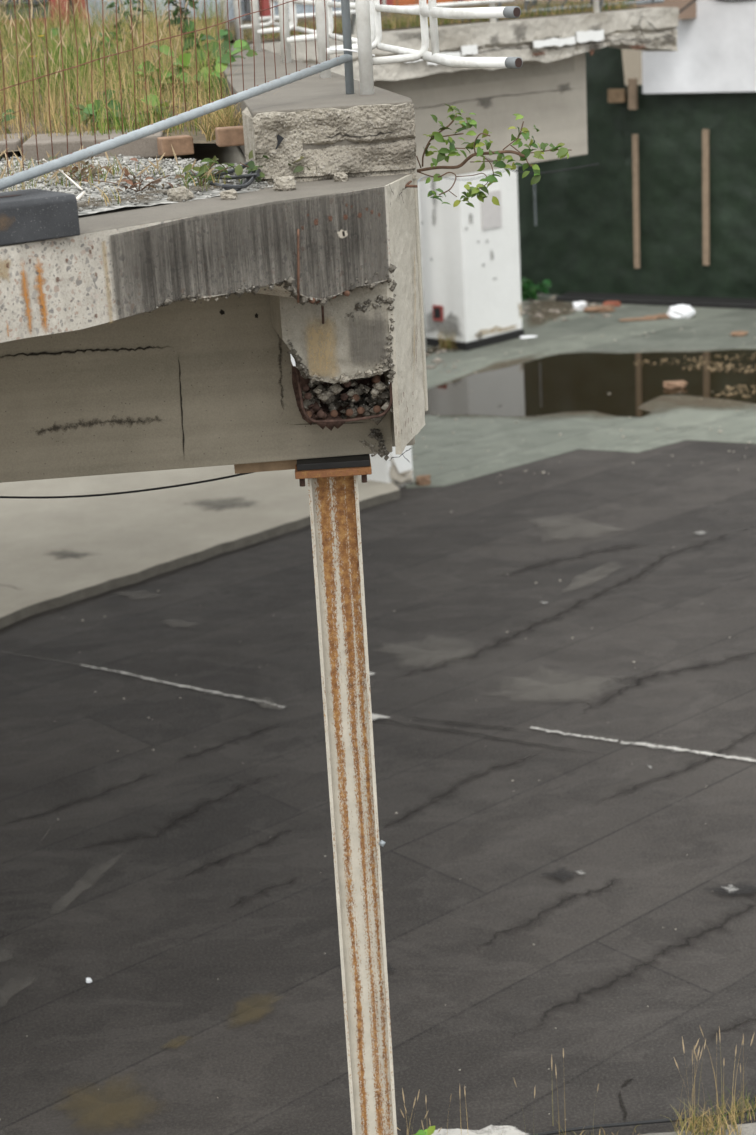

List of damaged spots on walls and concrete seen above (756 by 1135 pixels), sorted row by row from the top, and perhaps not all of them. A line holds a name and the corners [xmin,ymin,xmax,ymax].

peeling [398,44,478,65]
peeling [533,29,604,53]
spalling [632,34,676,44]
rust [0,259,60,330]
spalling [149,229,414,488]
crack [2,346,184,452]